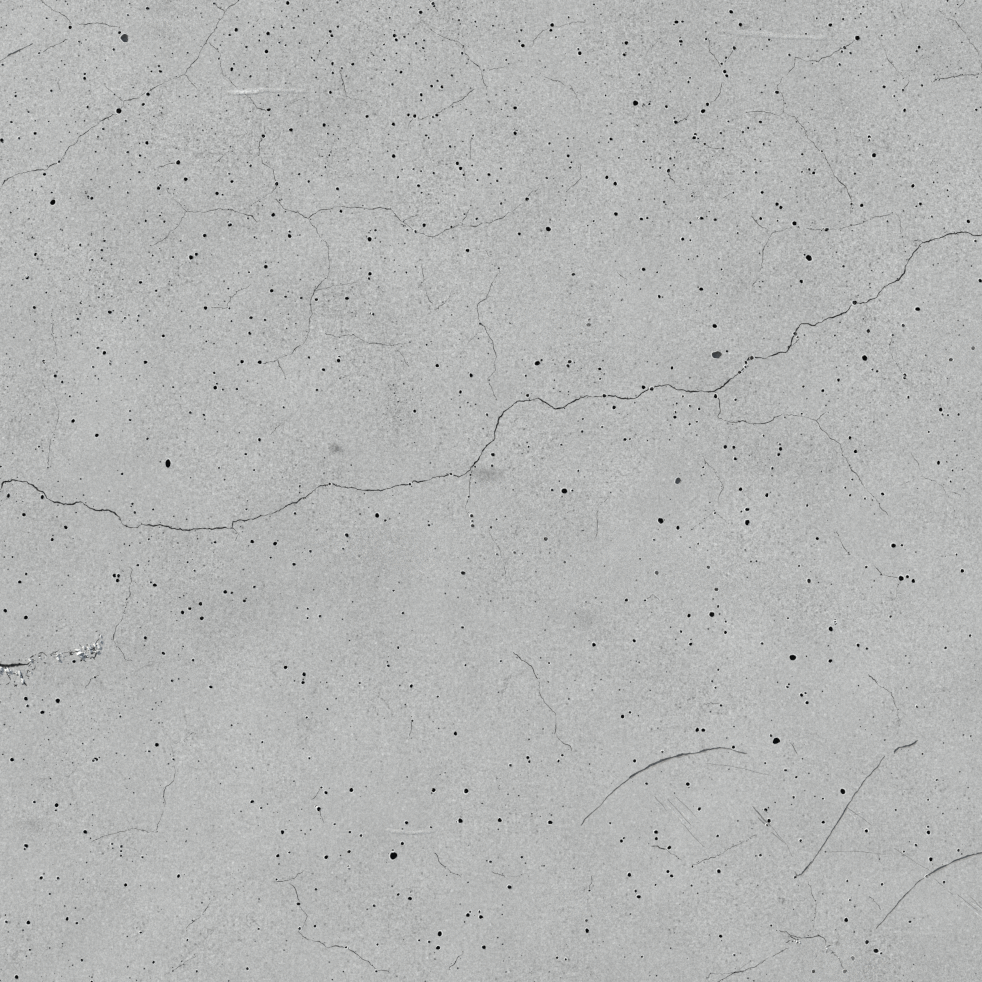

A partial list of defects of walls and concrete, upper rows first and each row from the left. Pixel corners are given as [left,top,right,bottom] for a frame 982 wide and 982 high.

crack [0,0,982,541]
spalling [0,631,102,687]